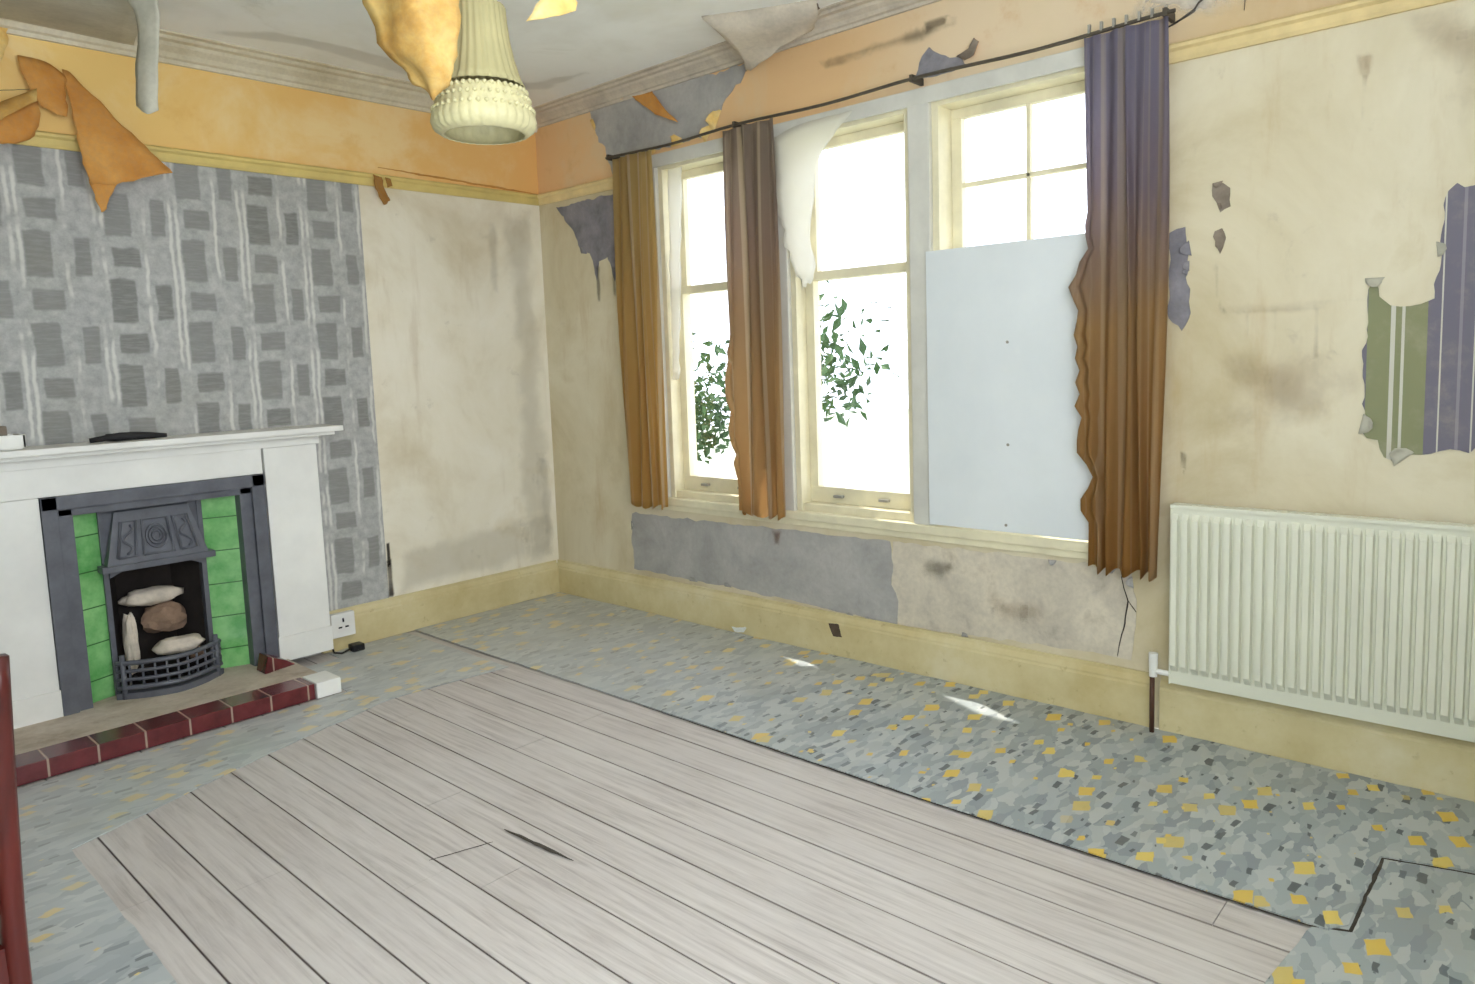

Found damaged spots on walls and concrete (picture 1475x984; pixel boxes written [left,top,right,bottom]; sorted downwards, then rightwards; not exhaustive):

peeling [590,64,746,174]
peeling [556,194,616,281]
flaking render [1168,227,1192,331]